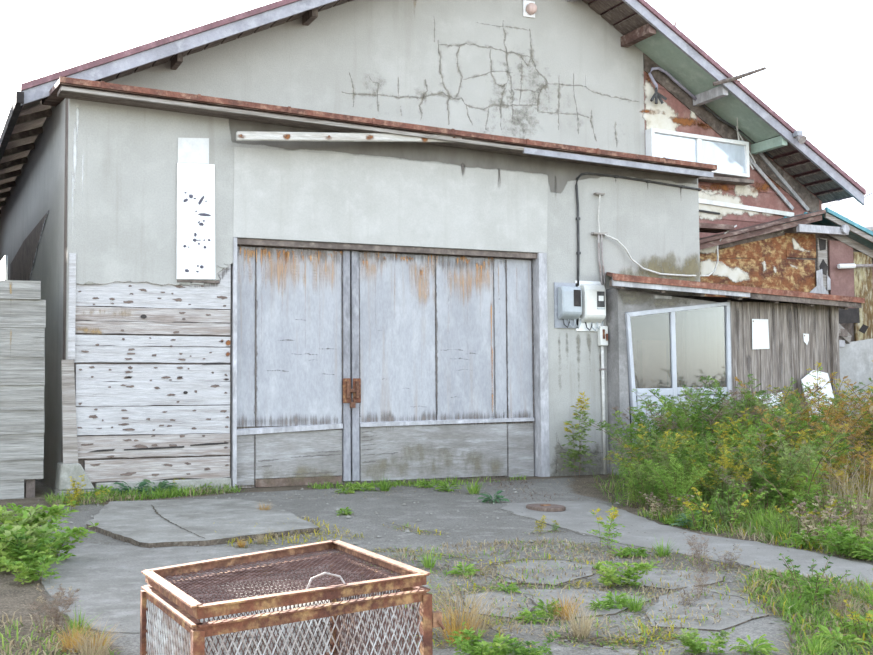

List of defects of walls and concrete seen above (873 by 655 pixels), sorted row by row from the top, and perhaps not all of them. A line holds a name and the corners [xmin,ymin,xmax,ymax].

peeling [643,80,681,131]
water stain [229,119,697,193]
peeling [698,185,773,221]
spalling [158,263,230,320]
corrosion [240,247,343,286]
water stain [630,257,700,282]
corrosion [700,233,816,298]
peeling [108,329,135,388]
peeling [150,331,191,403]
peeling [89,409,175,448]
crack [151,504,204,538]